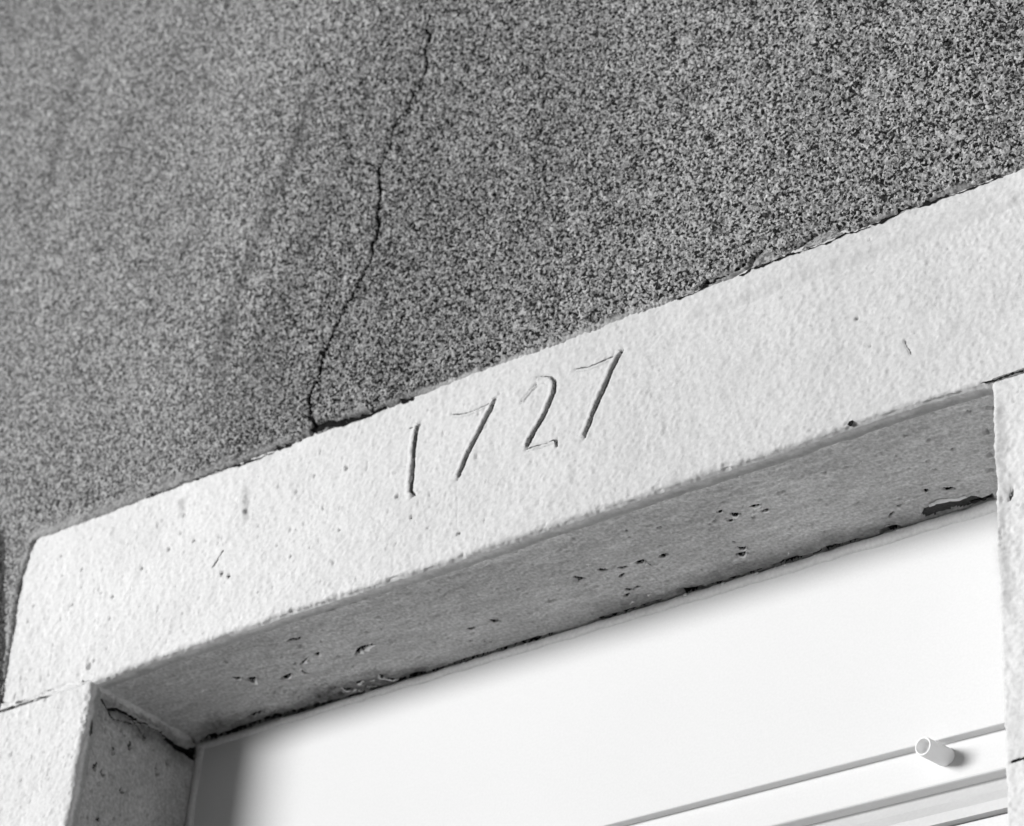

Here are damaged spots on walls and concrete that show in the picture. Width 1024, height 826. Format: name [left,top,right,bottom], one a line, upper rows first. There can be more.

crack [300,14,432,428]